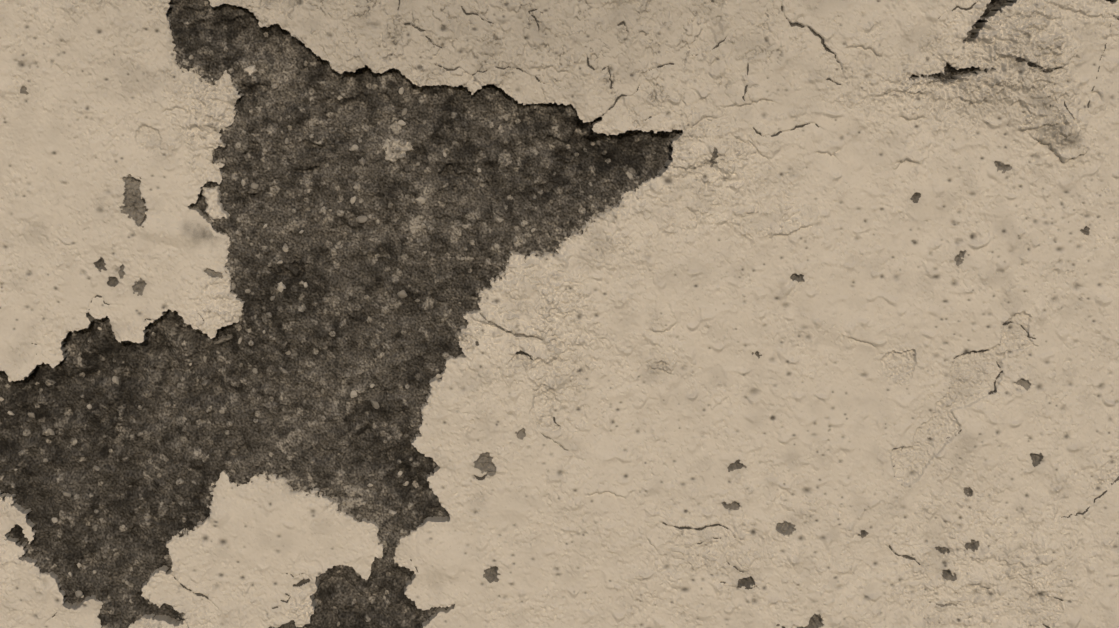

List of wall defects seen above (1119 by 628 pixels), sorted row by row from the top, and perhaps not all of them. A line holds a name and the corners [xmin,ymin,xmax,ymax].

crack [910,0,1013,82]
crack [1015,57,1062,73]
crack [1050,0,1119,118]
peeling [0,0,683,628]